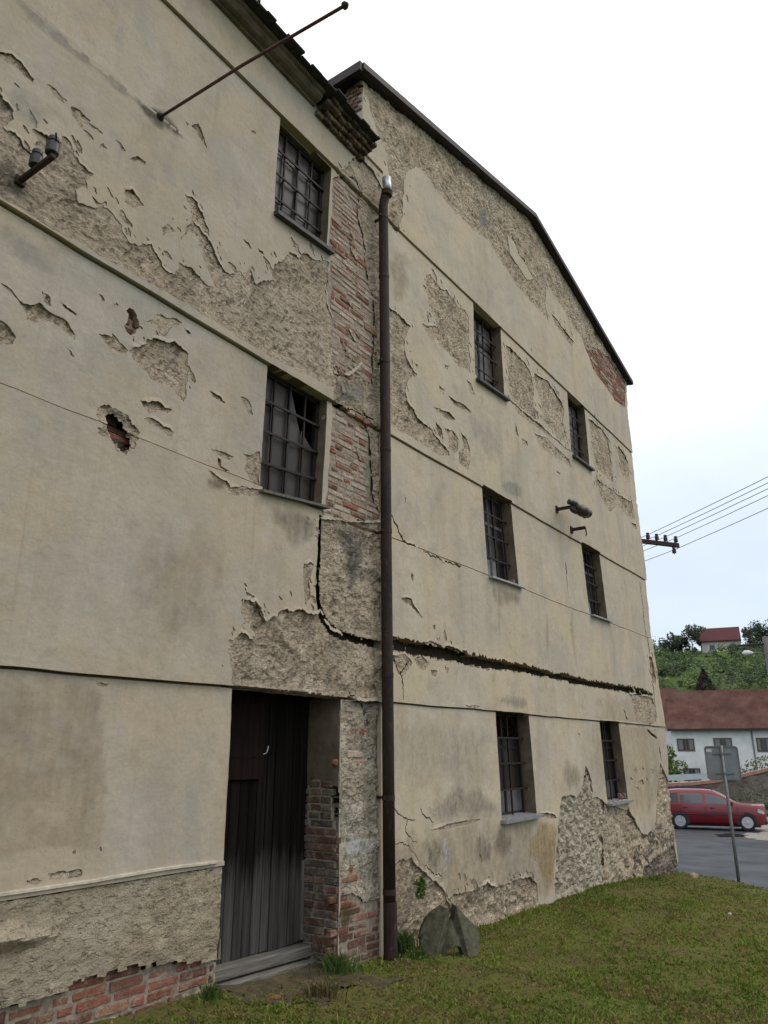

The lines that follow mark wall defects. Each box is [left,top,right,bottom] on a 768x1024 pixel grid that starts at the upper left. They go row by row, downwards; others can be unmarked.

flaking render [0,48,35,86]
flaking render [0,81,625,967]
flaking render [589,415,637,529]
crack [319,615,645,712]
flaking render [539,765,678,900]
flaking render [0,960,216,1024]